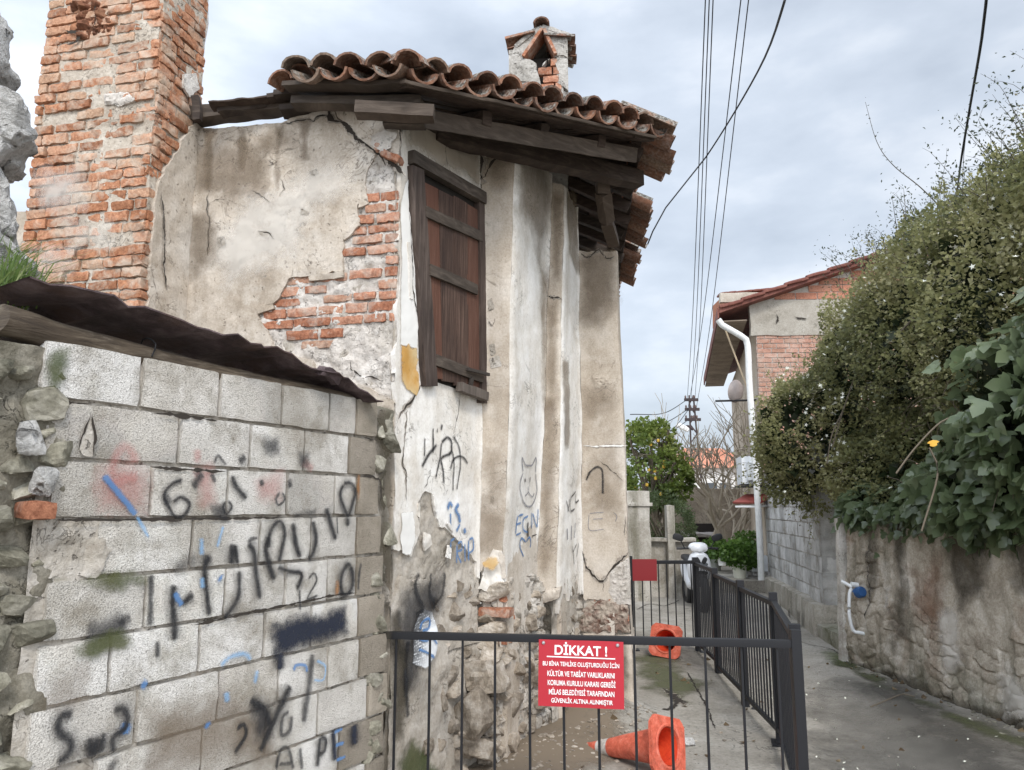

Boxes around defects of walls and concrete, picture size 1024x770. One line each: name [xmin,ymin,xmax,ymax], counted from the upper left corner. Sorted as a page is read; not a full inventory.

spalling [70,0,115,42]
crack [282,111,406,176]
crack [160,193,168,288]
spalling [255,155,418,399]
crack [363,385,431,505]
peeling [392,492,522,651]
crack [582,518,628,587]